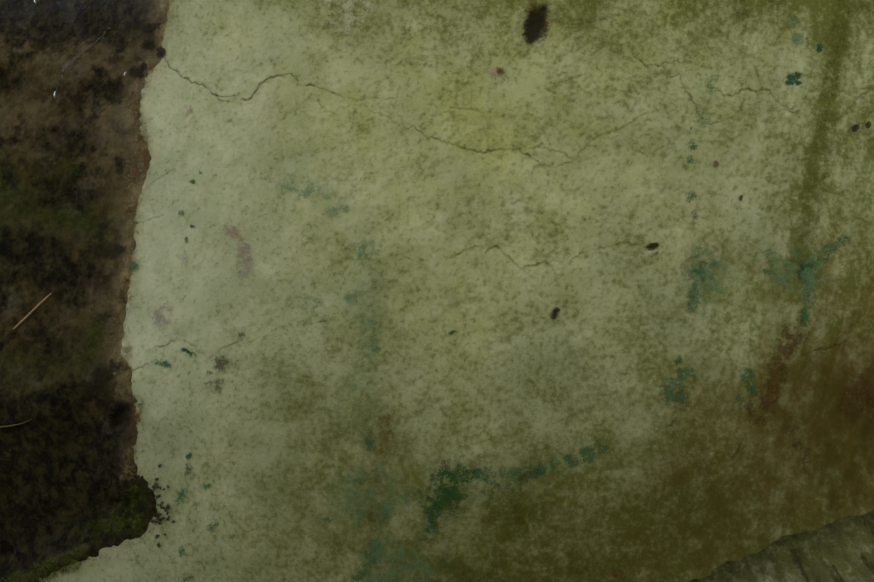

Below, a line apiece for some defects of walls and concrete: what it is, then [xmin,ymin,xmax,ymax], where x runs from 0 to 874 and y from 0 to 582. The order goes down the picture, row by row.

spalling [522,3,549,43]